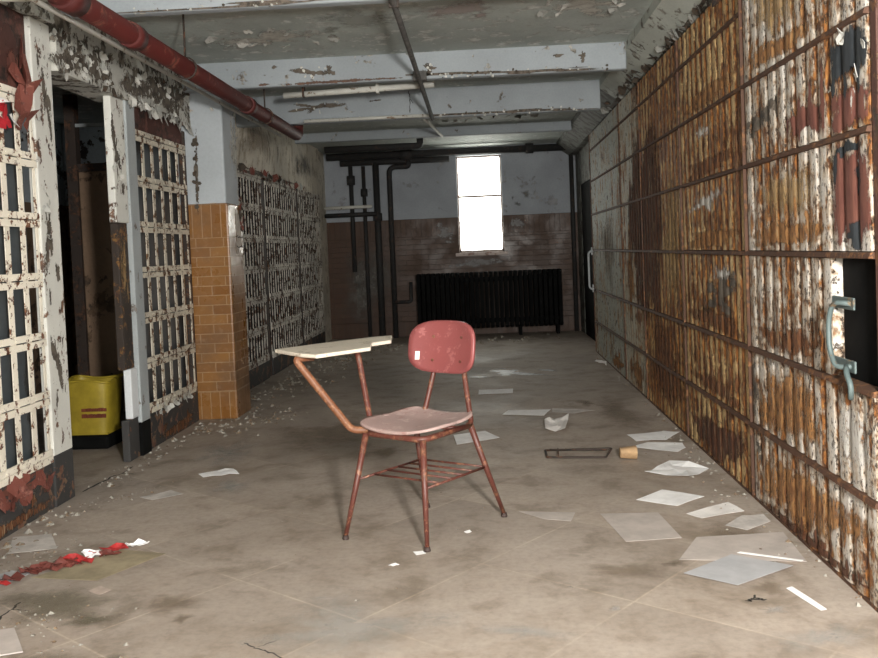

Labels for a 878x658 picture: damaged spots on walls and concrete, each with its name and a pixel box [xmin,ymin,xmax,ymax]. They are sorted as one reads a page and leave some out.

peeling [0,28,202,210]
peeling [290,65,335,79]
peeling [289,101,345,123]
peeling [418,0,712,122]
corrosion [683,42,830,276]
corrosion [750,0,819,70]
peeling [786,24,872,250]
peeling [43,186,60,281]
corrosion [611,125,746,463]
corrosion [758,291,822,357]
peeling [50,336,66,410]
crack [244,641,282,658]